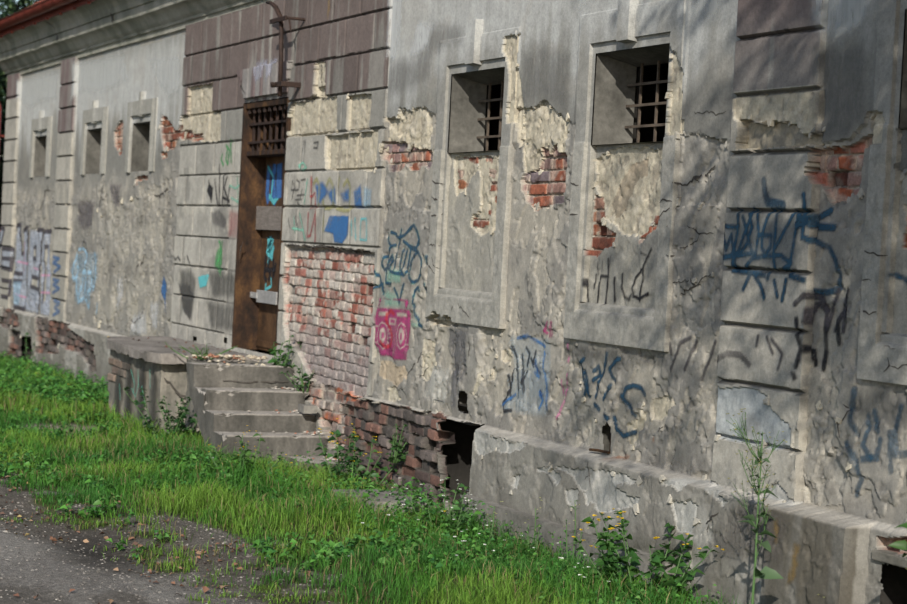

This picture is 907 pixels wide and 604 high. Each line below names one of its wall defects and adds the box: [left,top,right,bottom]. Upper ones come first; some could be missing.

flaking render [158,115,205,158]
spalling [378,106,433,172]
spalling [504,32,570,211]
spalling [665,46,885,210]
spalling [455,153,499,235]
spalling [586,144,663,257]
crack [659,166,715,257]
crack [673,274,711,295]
flaking render [0,308,97,372]
flaking render [283,244,458,513]
spalling [537,462,643,515]
spalling [714,385,854,507]